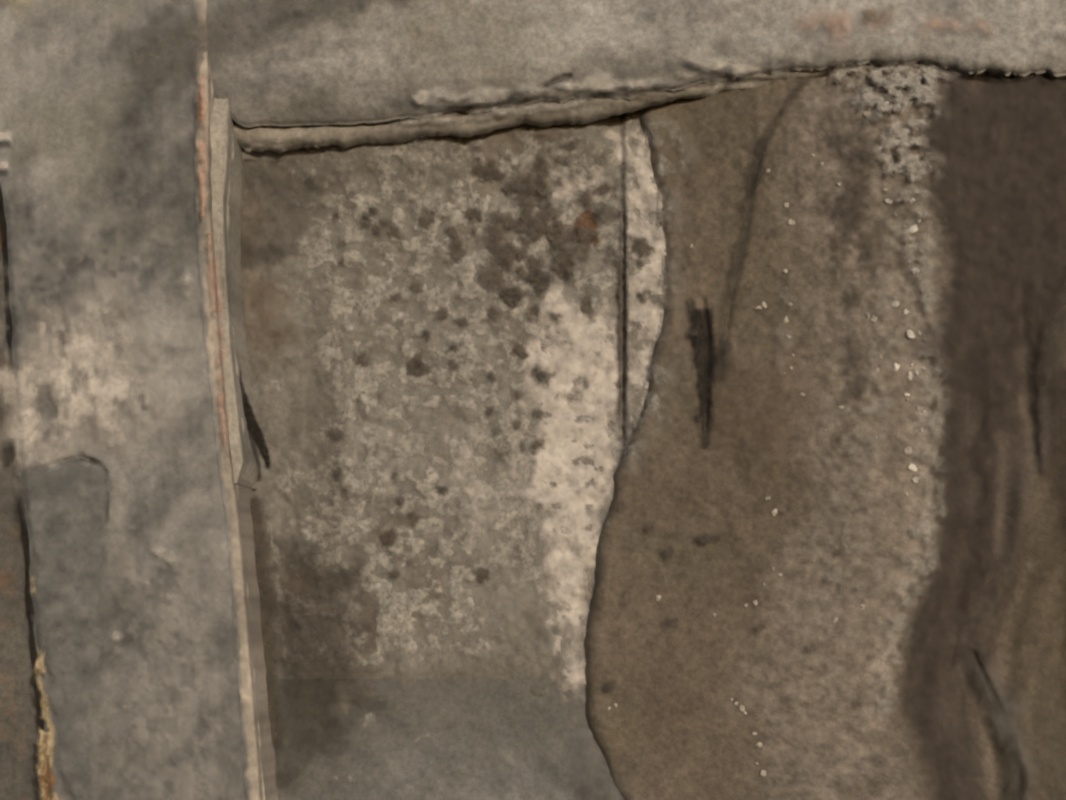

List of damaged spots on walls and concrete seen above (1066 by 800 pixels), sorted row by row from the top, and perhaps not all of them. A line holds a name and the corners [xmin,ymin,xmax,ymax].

rust [35,651,59,800]
damp [830,52,1066,800]